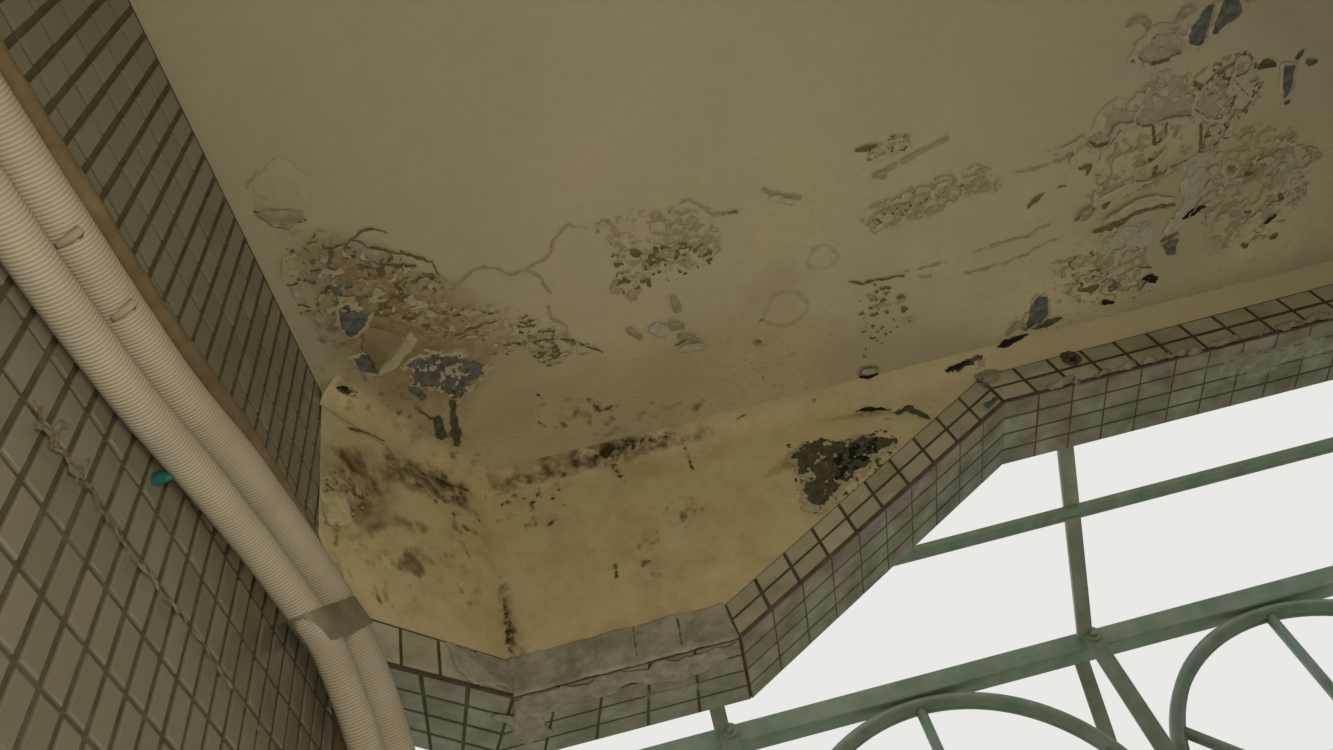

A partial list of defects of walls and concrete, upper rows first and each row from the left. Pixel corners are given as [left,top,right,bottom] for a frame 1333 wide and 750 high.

peeling [855,134,950,180]
peeling [861,164,1003,234]
peeling [998,0,1323,348]
peeling [596,199,740,303]
peeling [246,157,603,447]
peeling [945,355,1002,388]
spalling [1060,351,1082,366]
damp [386,456,476,532]
damp [525,436,667,506]